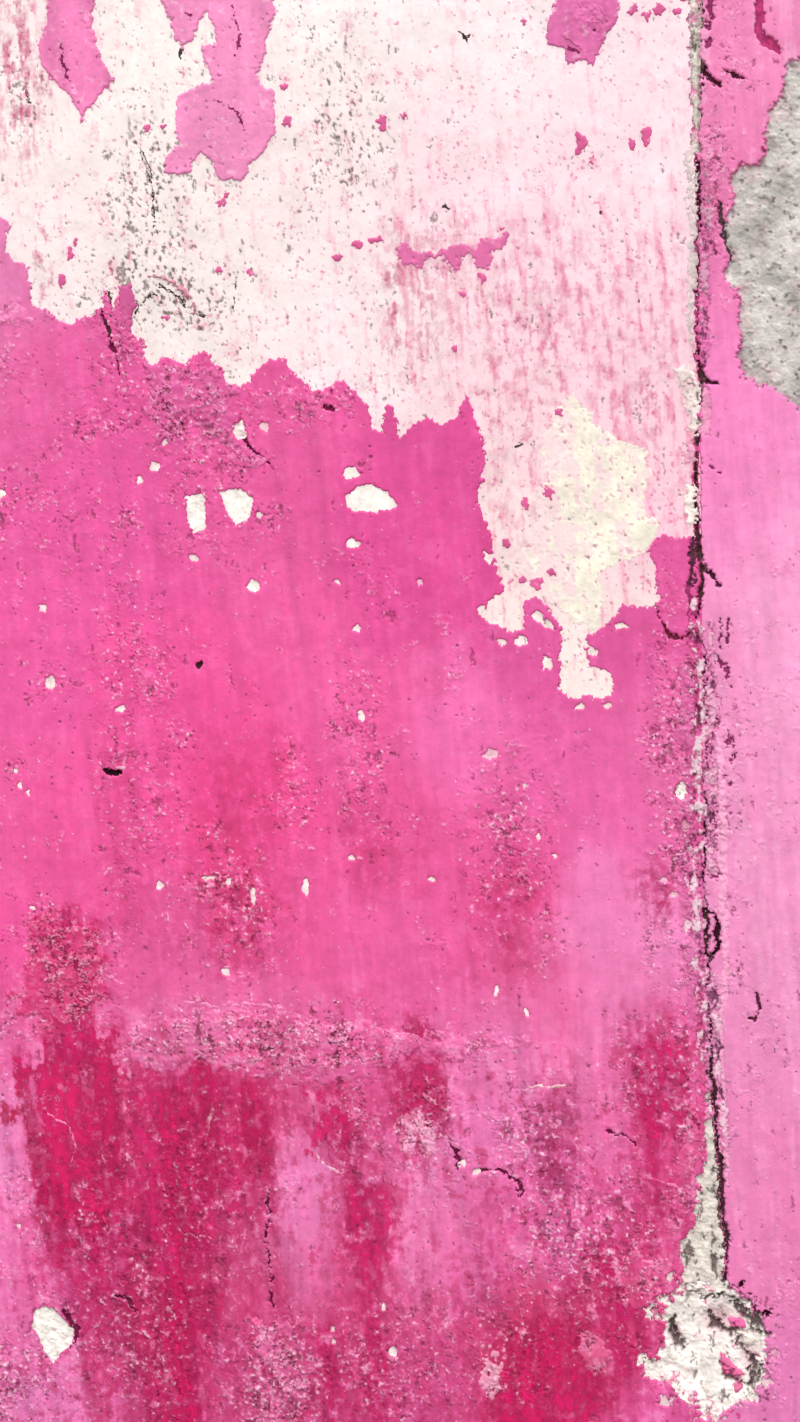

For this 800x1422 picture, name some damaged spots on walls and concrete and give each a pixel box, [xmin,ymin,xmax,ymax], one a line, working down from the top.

peeling [0,0,701,710]
spalling [720,59,800,411]
crack [655,0,745,1297]
crack [605,1129,637,1147]
peeling [32,1306,74,1363]
spalling [632,1271,780,1422]